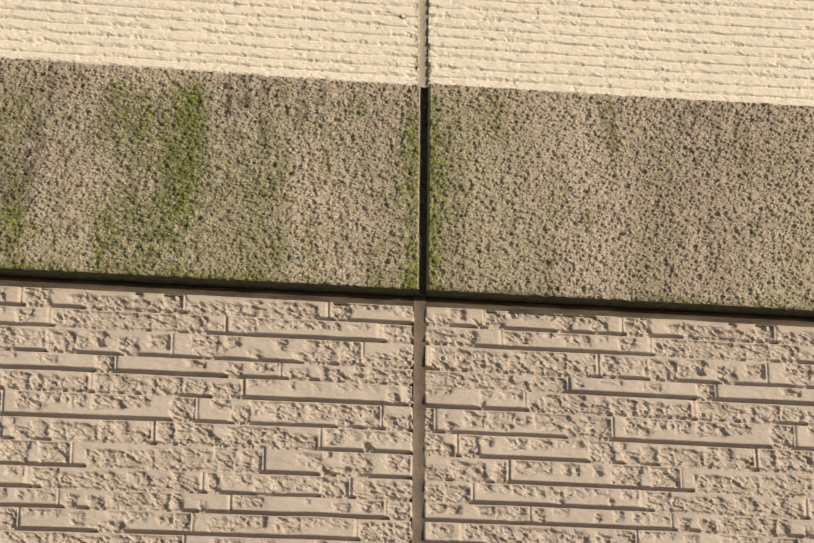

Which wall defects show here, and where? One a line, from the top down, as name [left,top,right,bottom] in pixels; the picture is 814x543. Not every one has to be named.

damp [104,83,261,281]
damp [399,99,450,291]